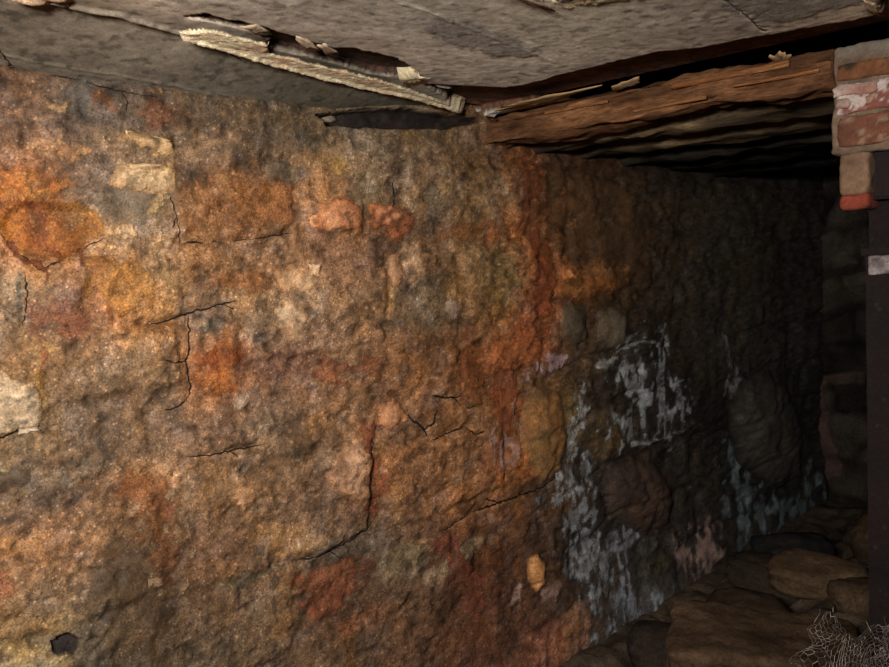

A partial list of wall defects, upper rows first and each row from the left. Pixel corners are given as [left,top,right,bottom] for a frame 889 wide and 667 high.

spalling [179,0,889,130]
crack [0,233,102,326]
rust [0,163,158,319]
crack [149,300,238,410]
rust [476,230,630,449]
crack [185,444,263,458]
crack [408,392,484,442]
crack [444,474,558,530]
leakage [535,323,831,644]
rust [290,555,378,620]
leakage [510,582,522,611]